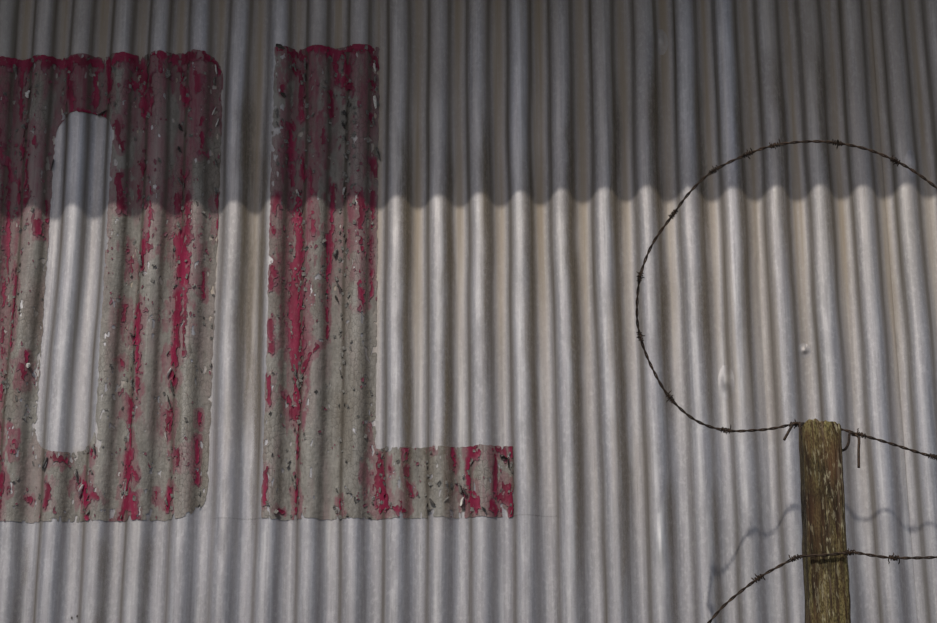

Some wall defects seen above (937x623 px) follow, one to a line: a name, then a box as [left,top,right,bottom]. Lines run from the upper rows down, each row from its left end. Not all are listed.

peeling [0,50,221,521]
peeling [262,44,381,517]
peeling [333,414,513,519]